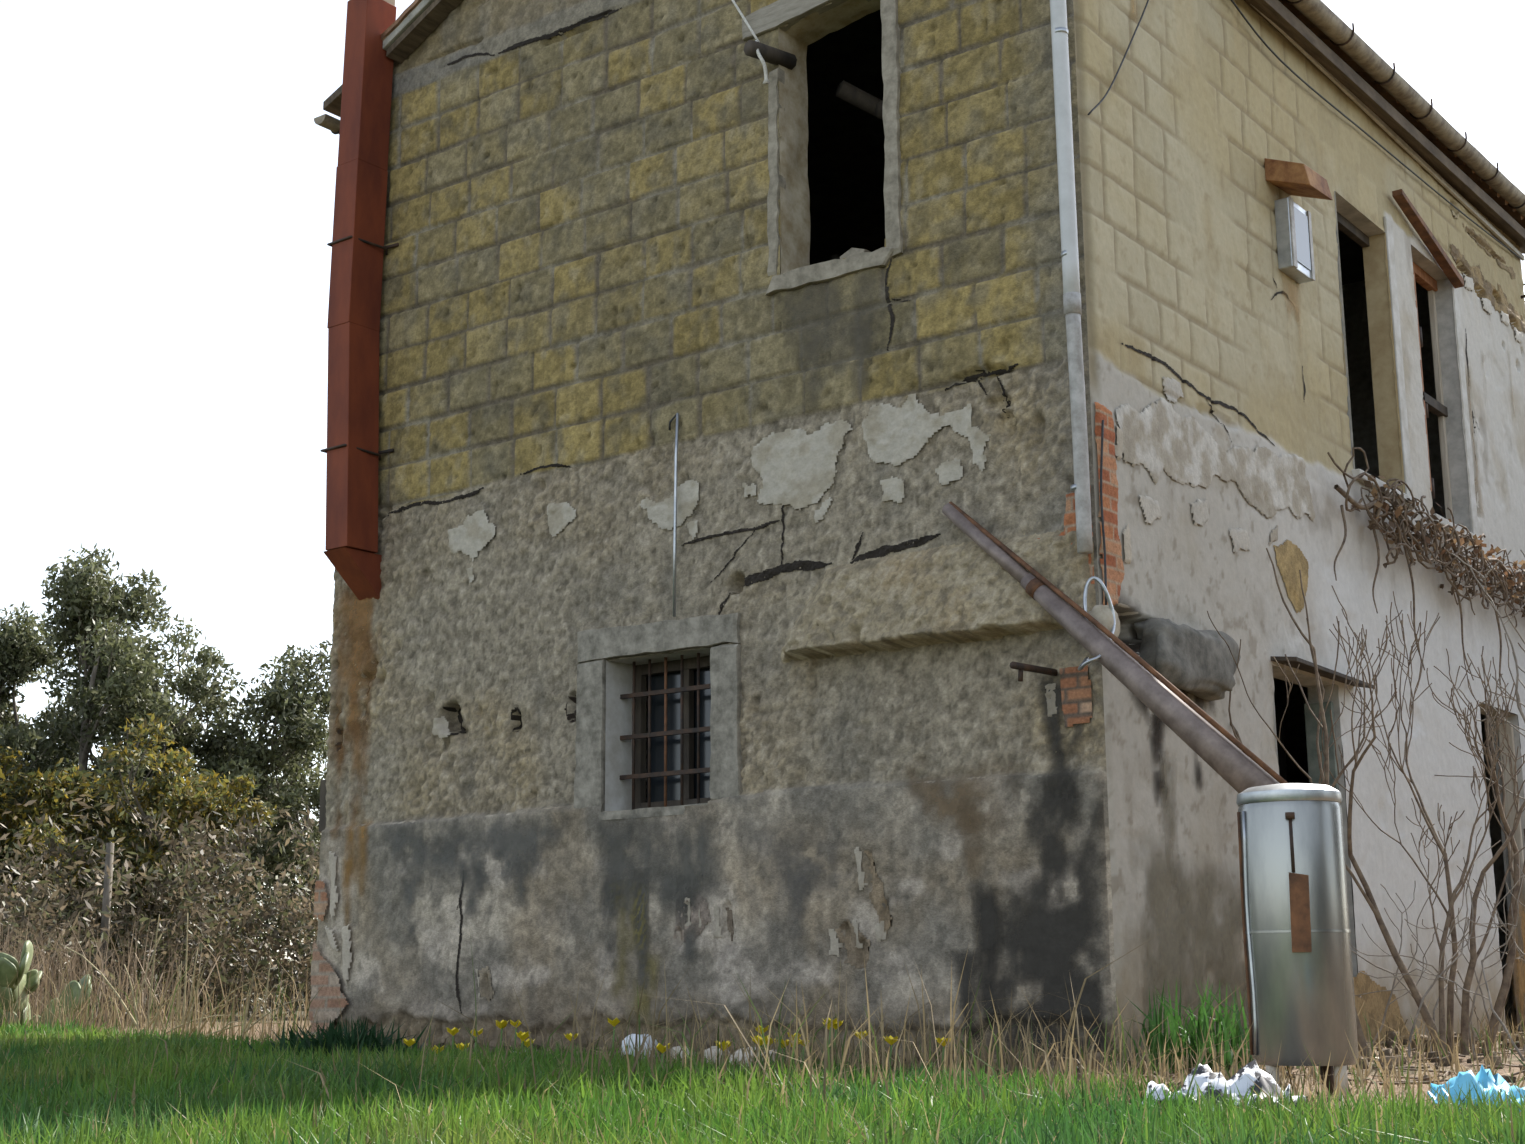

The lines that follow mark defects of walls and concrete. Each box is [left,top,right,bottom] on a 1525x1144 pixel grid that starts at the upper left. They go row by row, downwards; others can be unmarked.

crack [1122,343,1275,446]
flaking render [742,393,991,523]
spalling [432,705,466,740]
spalling [309,851,352,1038]
spalling [673,892,734,942]
spalling [828,847,892,968]